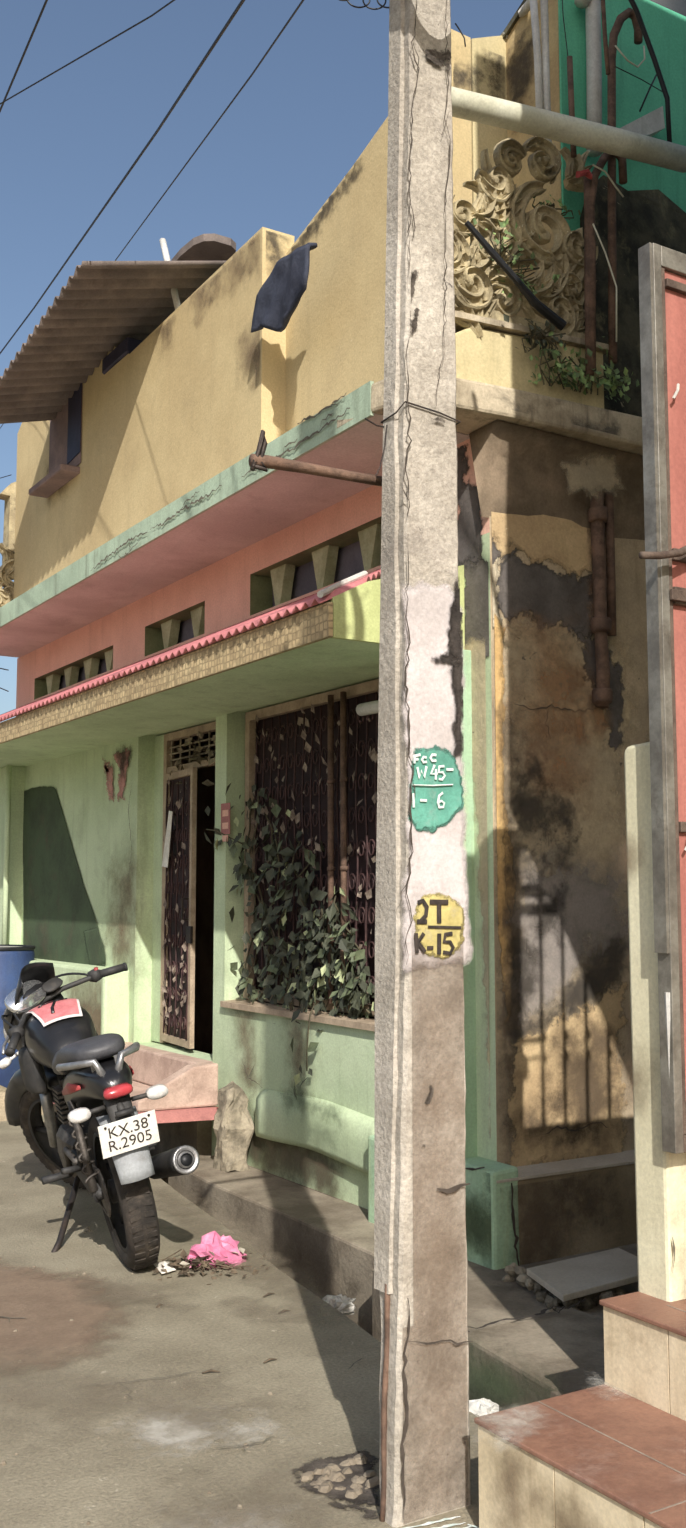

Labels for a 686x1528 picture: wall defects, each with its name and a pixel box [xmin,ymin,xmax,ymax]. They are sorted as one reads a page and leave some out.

leakage [453,40,533,104]
leakage [249,171,359,263]
leakage [246,340,260,377]
crack [401,555,415,965]
peeling [432,444,633,1167]
leakage [506,760,624,1139]
crack [401,1298,586,1520]